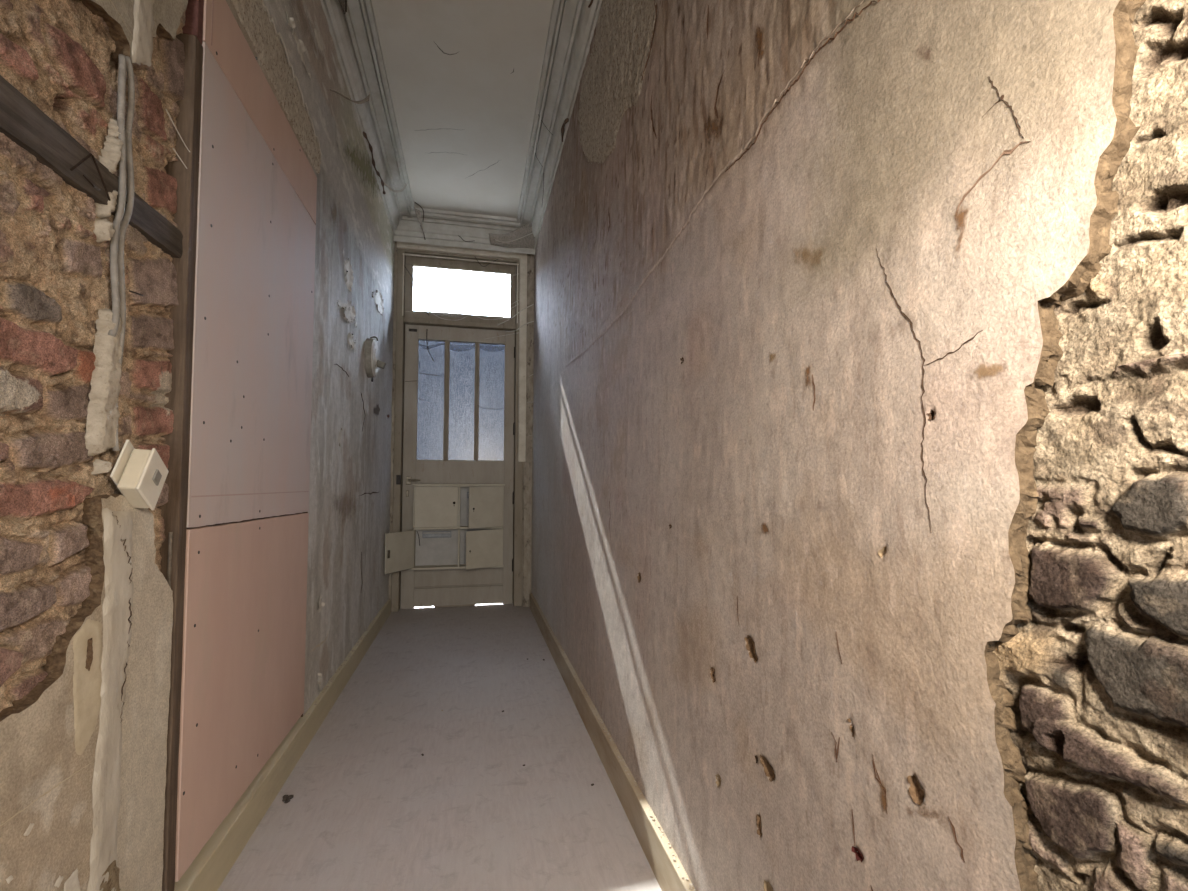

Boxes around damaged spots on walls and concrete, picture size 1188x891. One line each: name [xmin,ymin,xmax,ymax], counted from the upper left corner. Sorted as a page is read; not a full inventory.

flaking render [0,0,186,228]
crack [955,76,1031,219]
flaking render [0,132,178,755]
crack [876,249,981,530]
flaking render [984,0,1188,891]
peeling [54,869,81,891]
spalling [99,860,120,891]